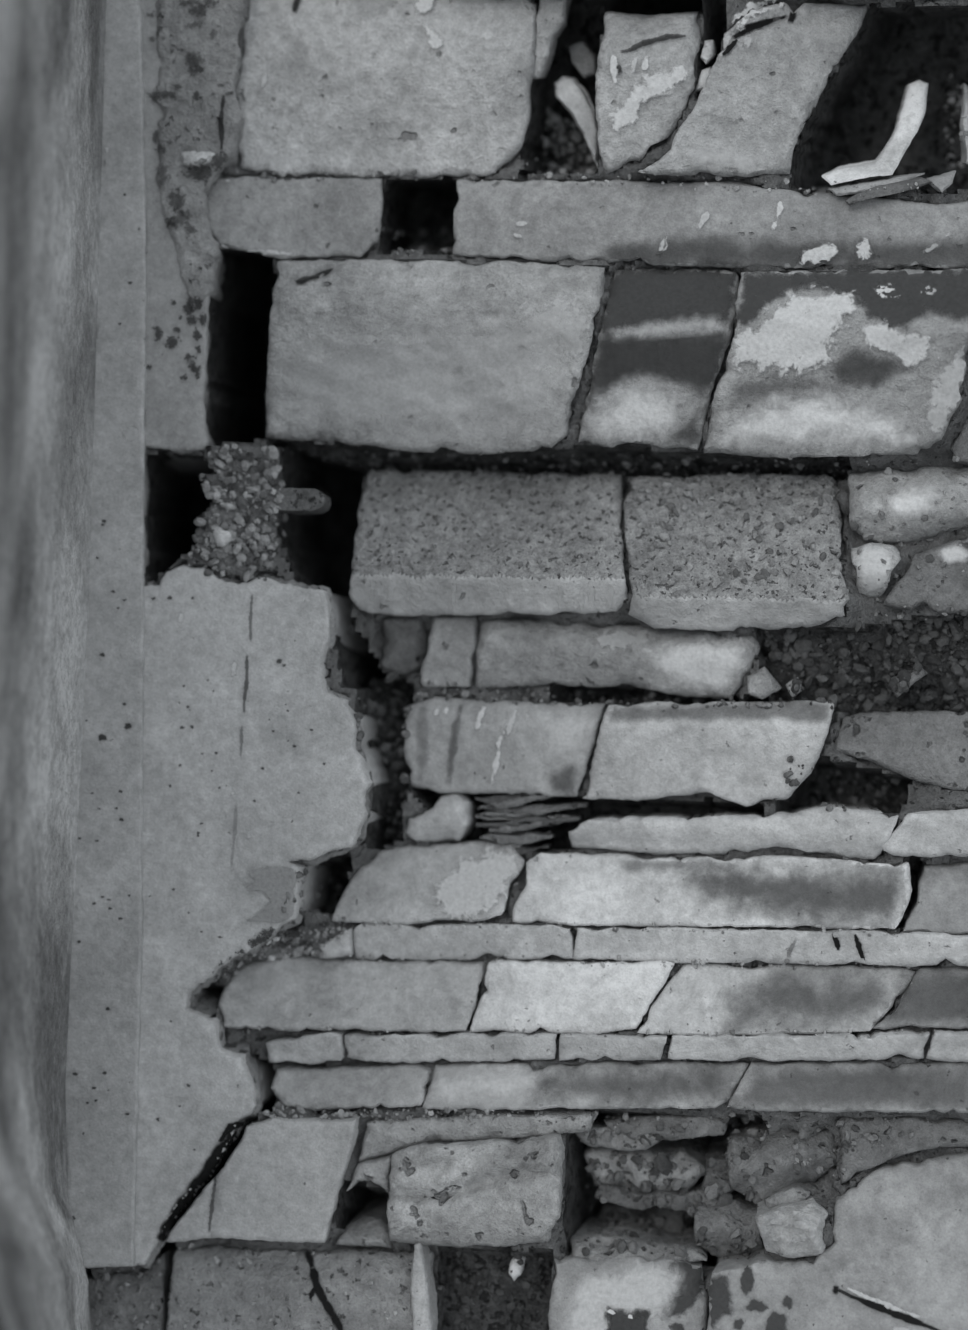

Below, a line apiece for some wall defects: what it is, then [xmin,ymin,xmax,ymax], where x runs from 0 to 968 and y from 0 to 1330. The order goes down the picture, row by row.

water stain [221,245,293,256]
spalling [188,443,293,583]
spalling [212,929,314,986]
spalling [221,1032,265,1053]
crack [157,1116,258,1241]
crack [305,1251,343,1330]
water stain [567,1253,792,1330]
crack [833,1286,939,1330]